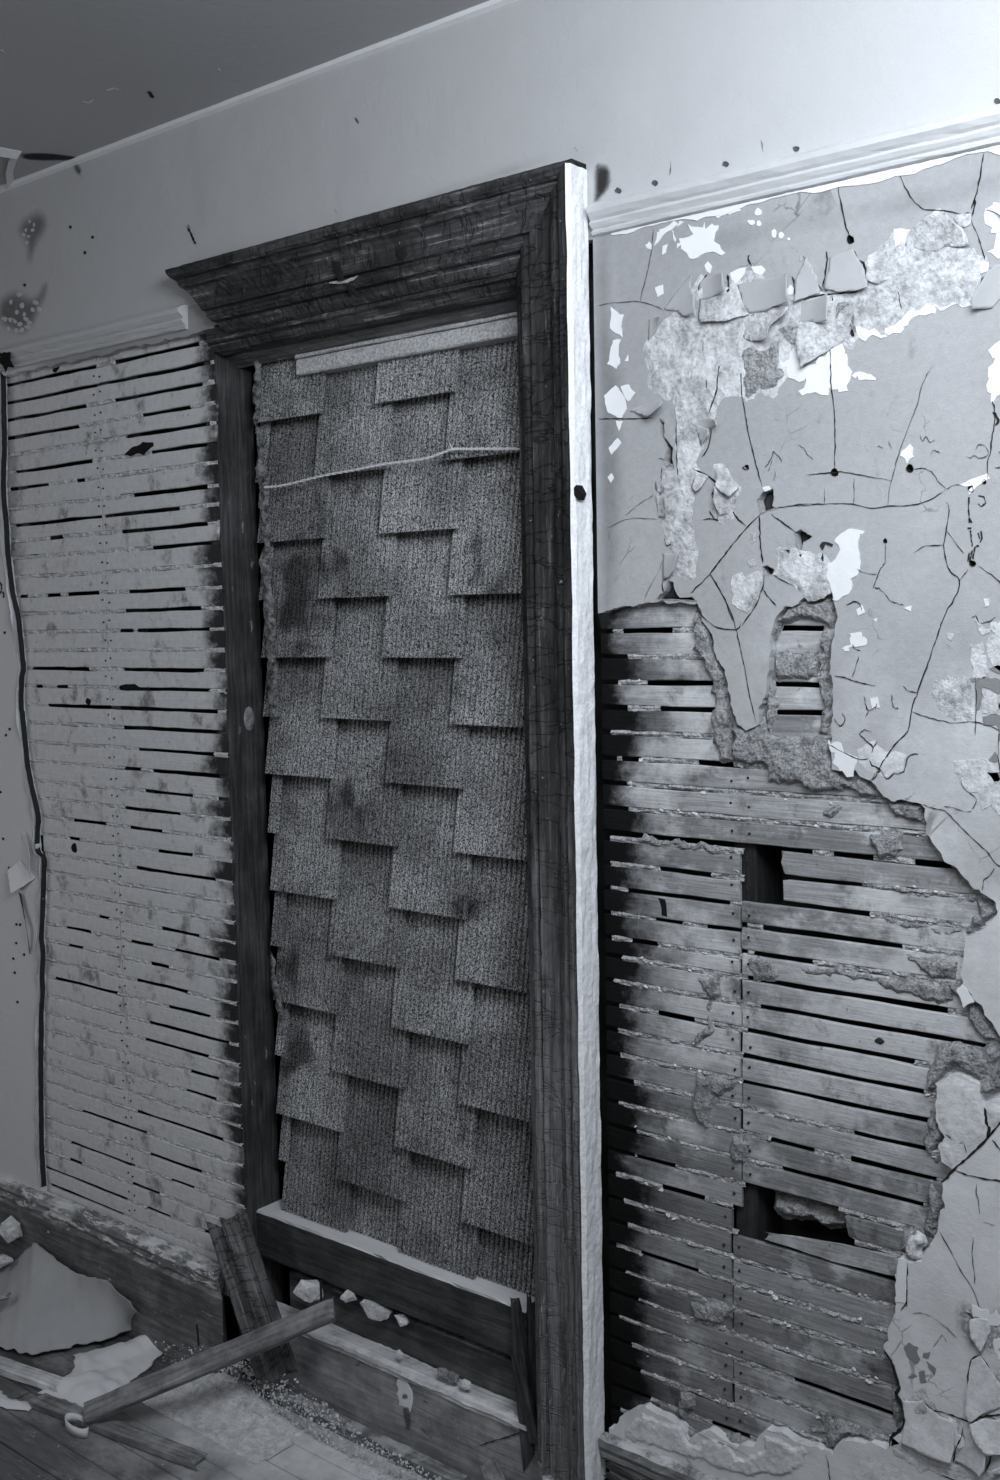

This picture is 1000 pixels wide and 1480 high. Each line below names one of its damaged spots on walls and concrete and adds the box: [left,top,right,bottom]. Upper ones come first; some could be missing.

crack [900,154,985,283]
damp [1,292,41,333]
spalling [130,342,207,454]
spalling [143,485,211,550]
crack [598,187,1000,781]
spalling [150,668,218,734]
spalling [153,749,219,881]
peeling [589,145,1000,1433]
crack [921,777,1000,890]
spalling [162,926,229,1100]
crack [884,1108,1000,1480]
peeling [794,1305,1000,1480]